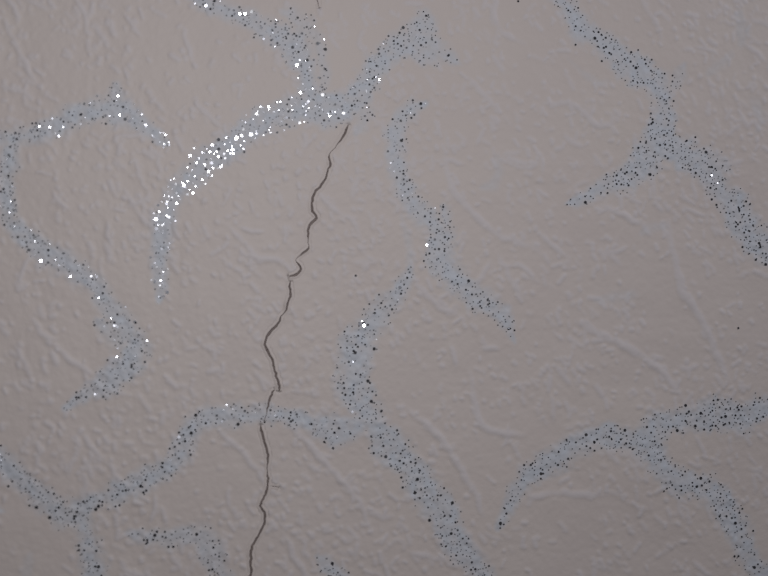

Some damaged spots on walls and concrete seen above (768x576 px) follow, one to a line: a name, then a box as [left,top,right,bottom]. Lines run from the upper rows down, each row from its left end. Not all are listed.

crack [245,124,352,576]